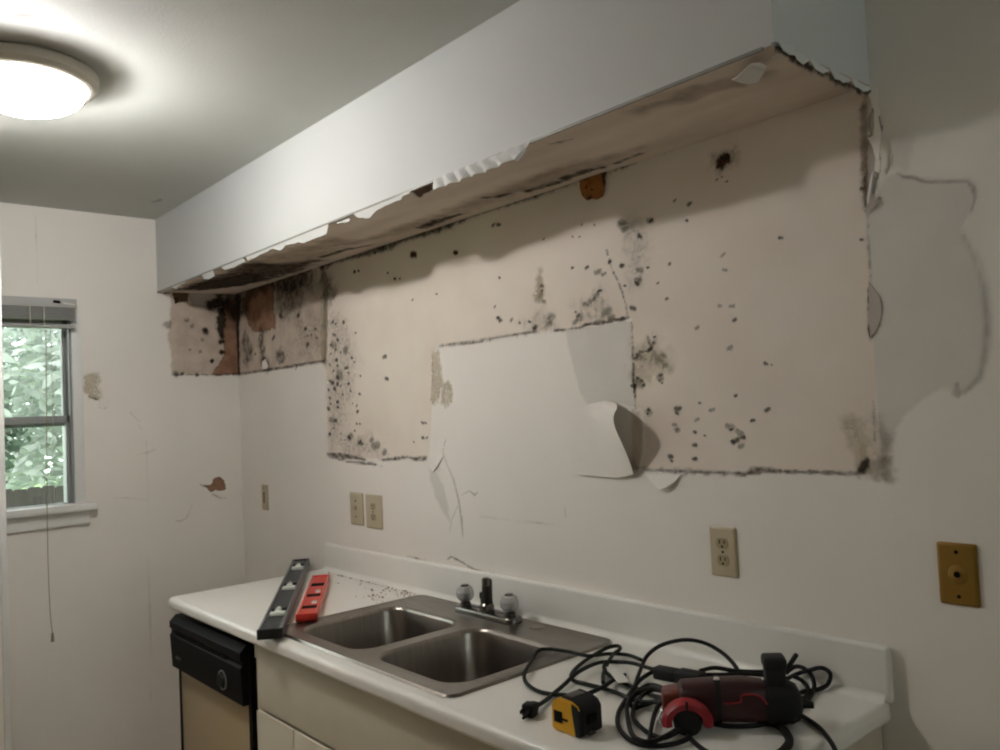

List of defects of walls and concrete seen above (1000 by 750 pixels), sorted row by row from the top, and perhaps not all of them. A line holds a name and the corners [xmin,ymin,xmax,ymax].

leakage [483,153,641,206]
leakage [174,214,466,375]
peeling [164,42,992,526]
leakage [327,321,386,452]